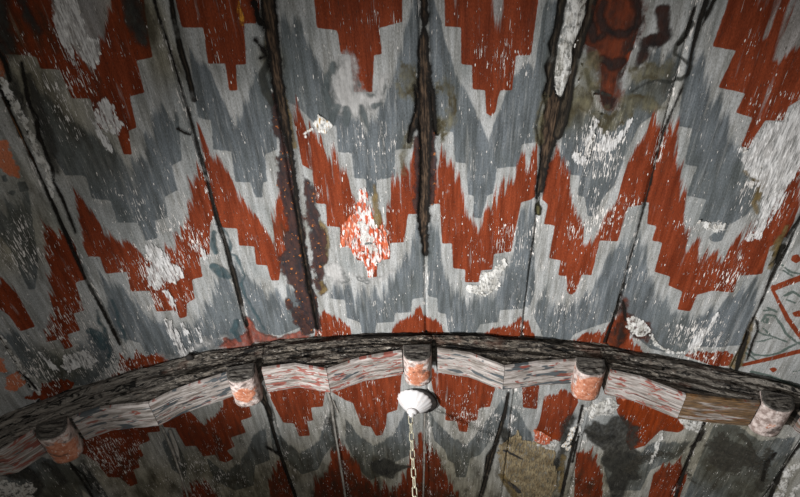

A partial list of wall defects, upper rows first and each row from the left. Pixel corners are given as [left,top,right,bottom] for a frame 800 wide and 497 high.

water stain [570,0,695,133]
peeling [89,97,124,153]
peeling [304,114,332,138]
peeling [572,118,633,165]
peeling [737,104,800,242]
peeling [340,187,390,277]
peeling [466,258,508,297]
peeling [626,312,722,354]